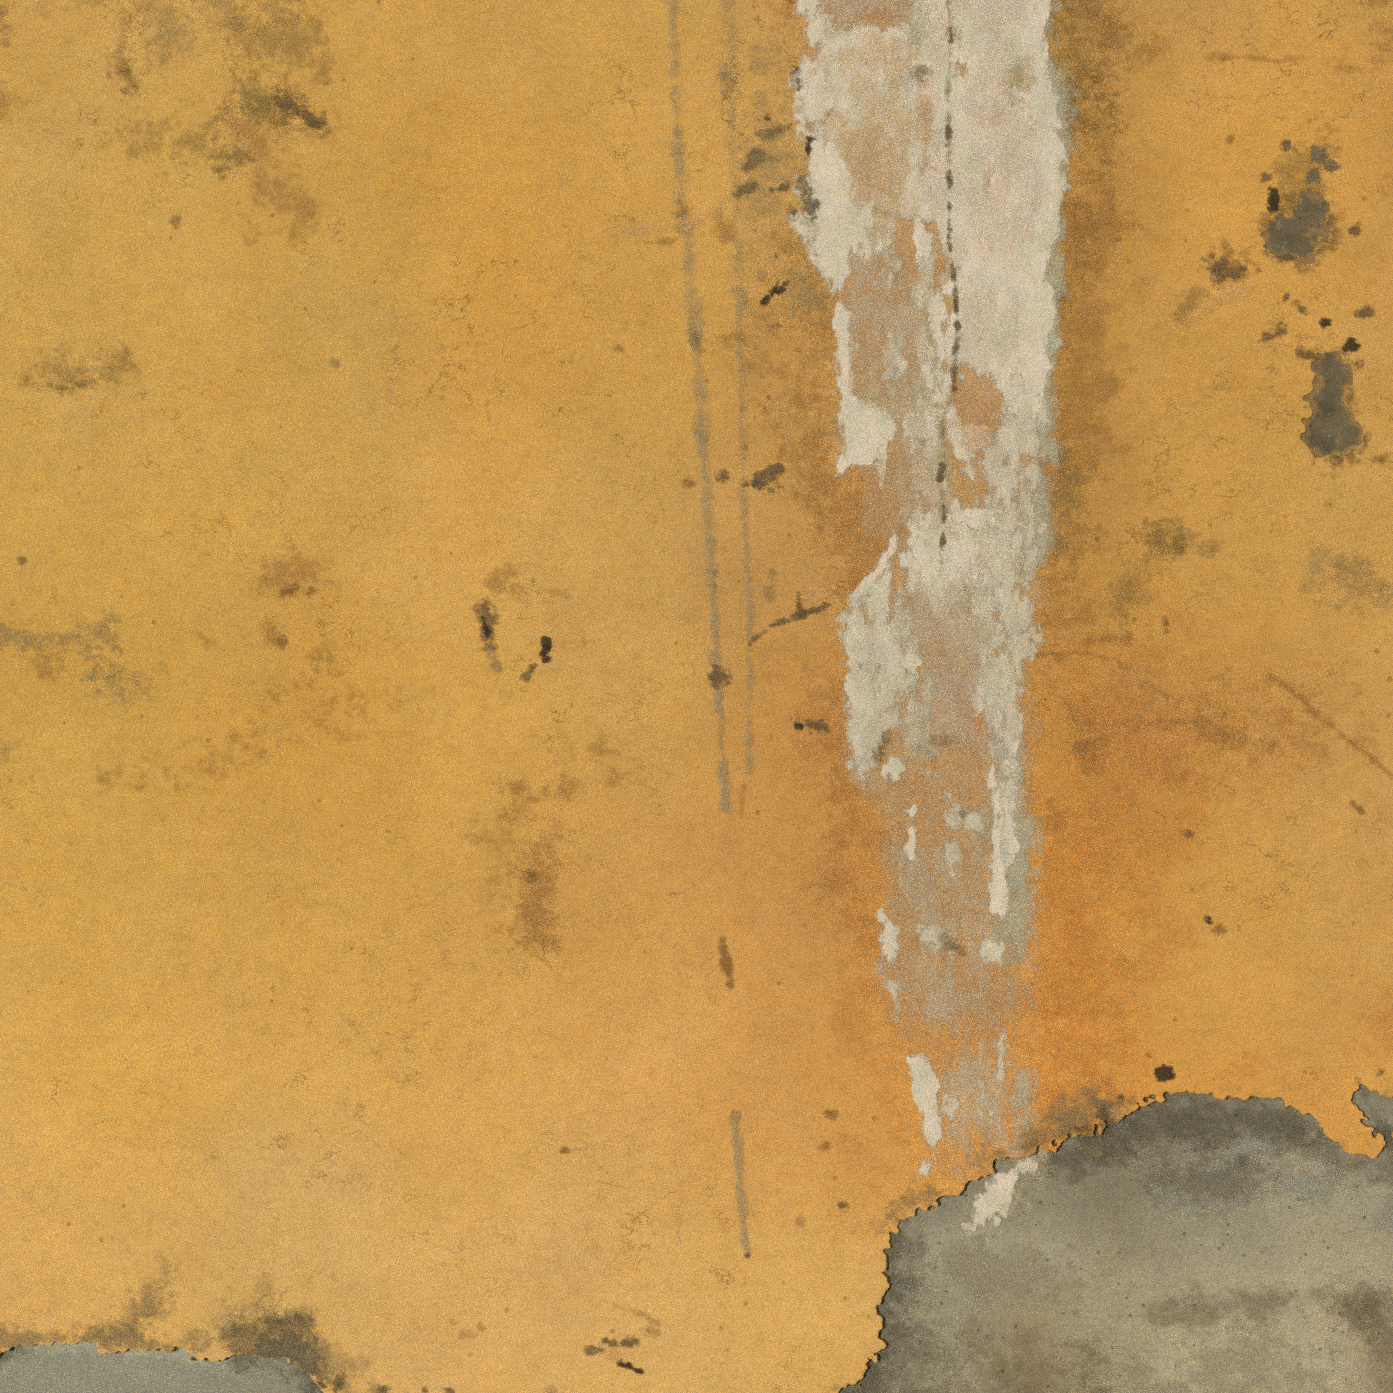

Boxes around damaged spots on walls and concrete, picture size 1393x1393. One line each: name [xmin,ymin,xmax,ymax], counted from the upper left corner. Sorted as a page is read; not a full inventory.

leakage [708,665,732,688]
peeling [733,0,1393,1393]
spalling [0,1341,345,1393]